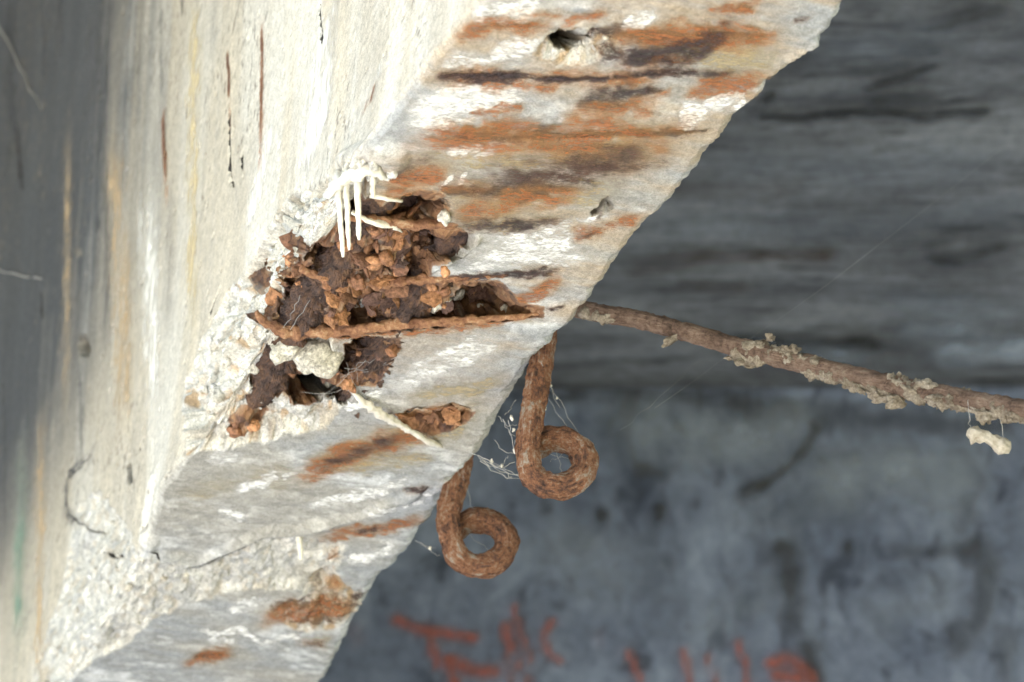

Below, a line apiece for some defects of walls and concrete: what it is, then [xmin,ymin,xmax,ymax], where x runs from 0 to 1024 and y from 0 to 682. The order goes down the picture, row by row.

spalling [528,24,622,68]
corrosion [386,0,772,234]
water stain [324,164,403,203]
water stain [351,210,402,233]
corrosion [573,215,637,241]
spalling [181,149,545,457]
corrosion [449,266,564,311]
corrosion [303,429,427,482]
crack [65,455,125,559]
corrosion [266,519,417,647]
corrosion [186,647,229,666]